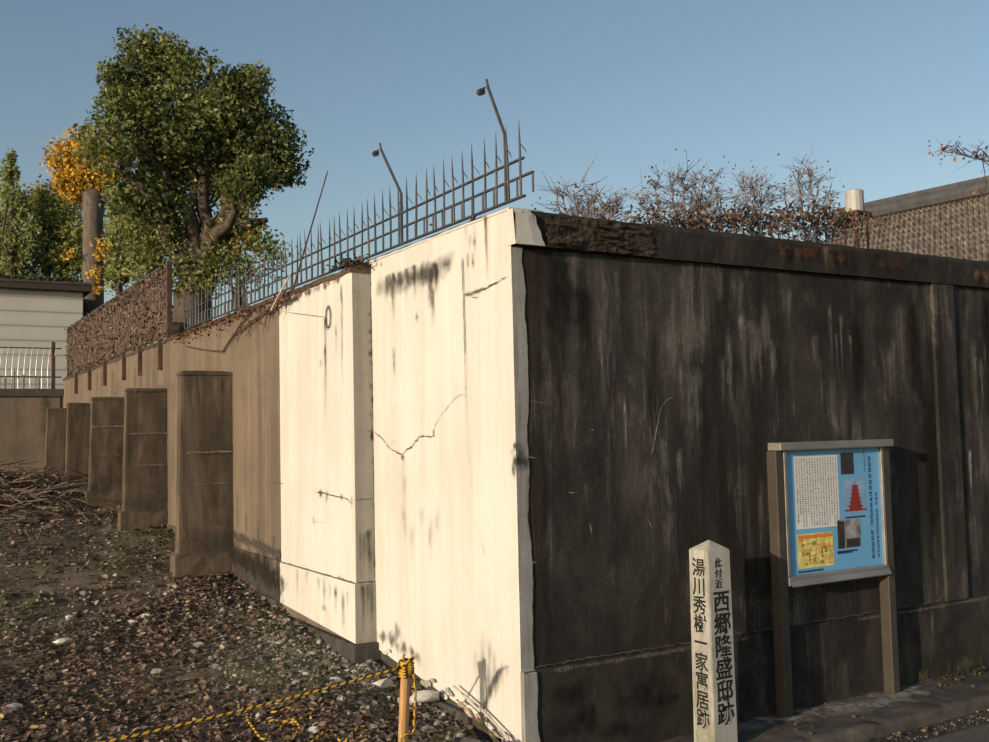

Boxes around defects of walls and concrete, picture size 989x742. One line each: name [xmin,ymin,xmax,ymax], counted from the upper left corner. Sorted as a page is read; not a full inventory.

water stain [370,258,449,308]
crack [462,276,505,366]
water stain [738,315,775,373]
crack [374,394,471,484]
water stain [219,532,283,603]